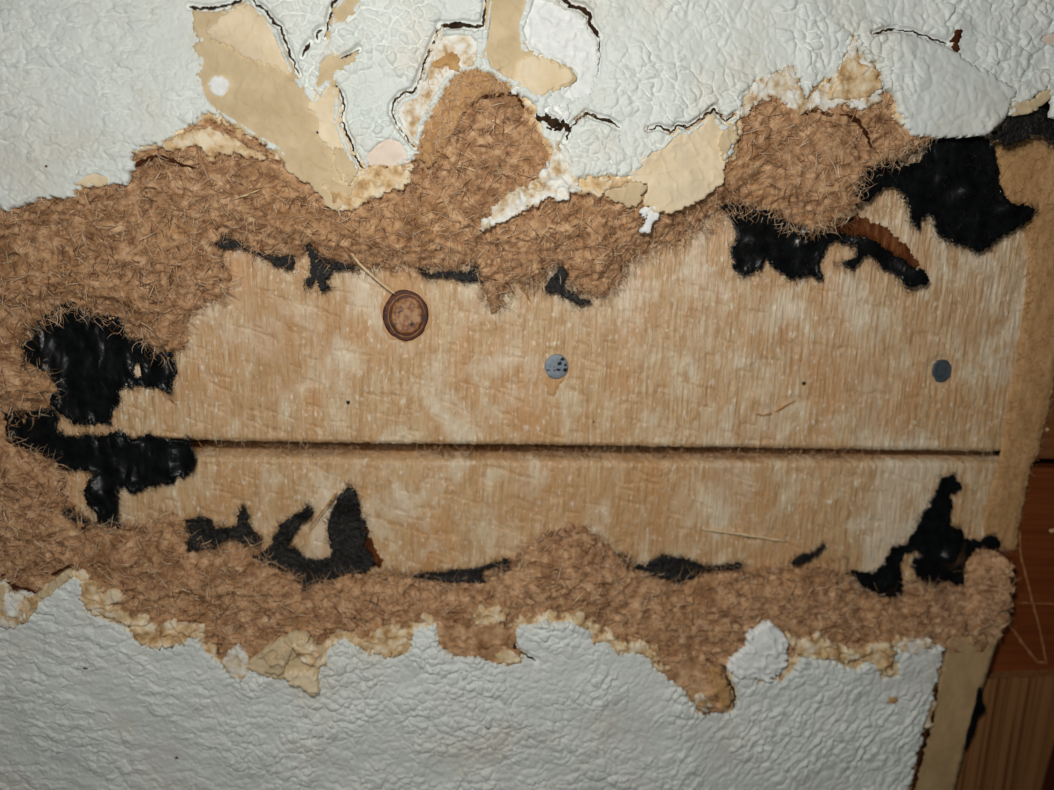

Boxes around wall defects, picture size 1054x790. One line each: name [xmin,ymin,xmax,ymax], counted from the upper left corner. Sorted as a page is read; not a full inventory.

crack [189,0,338,73]
peeling [162,0,416,221]
crack [336,85,363,168]
crack [391,0,487,147]
peeling [392,0,740,237]
crack [562,0,600,69]
crack [566,112,620,140]
crack [648,108,734,133]
peeling [1010,89,1051,117]
spalling [0,568,203,650]
spalling [284,622,413,697]
spalling [784,626,939,678]